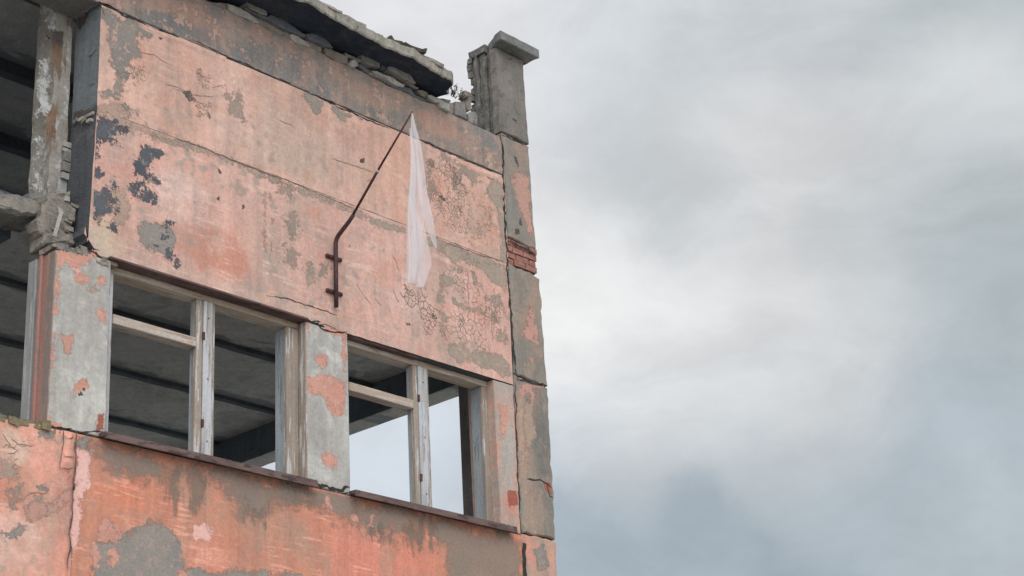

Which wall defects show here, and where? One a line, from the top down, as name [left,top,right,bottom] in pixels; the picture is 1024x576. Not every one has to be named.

peeling [73,7,407,286]
peeling [50,333,74,371]
spalling [73,378,90,397]
crack [267,295,346,333]
peeling [307,326,348,419]
crack [357,134,552,576]
peeling [425,150,544,468]
crack [3,426,104,567]
peeling [0,436,302,576]
peeling [321,452,339,471]